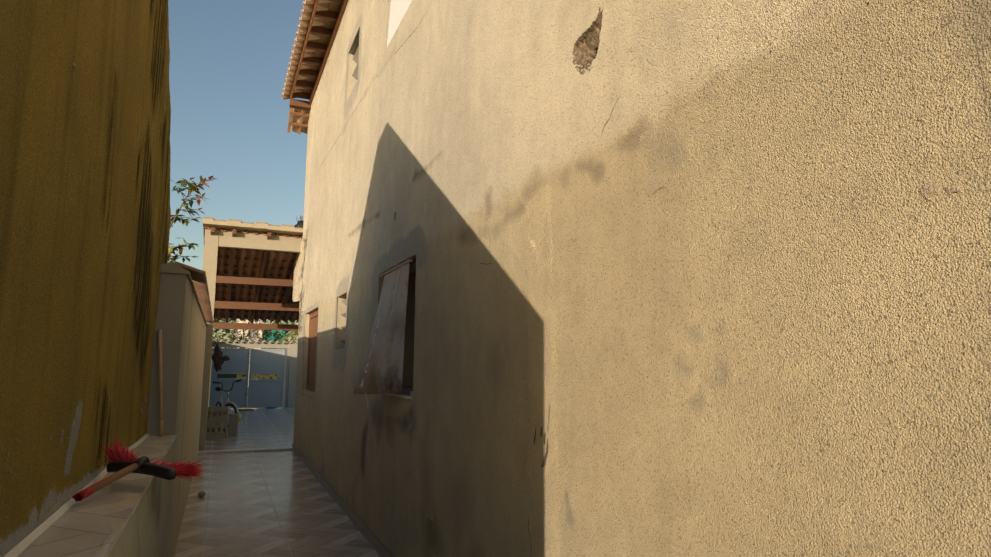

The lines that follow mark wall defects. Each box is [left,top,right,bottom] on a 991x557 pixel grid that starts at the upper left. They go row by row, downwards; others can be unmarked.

spalling [564,0,612,99]
damp [449,66,728,252]
peeling [61,399,83,479]